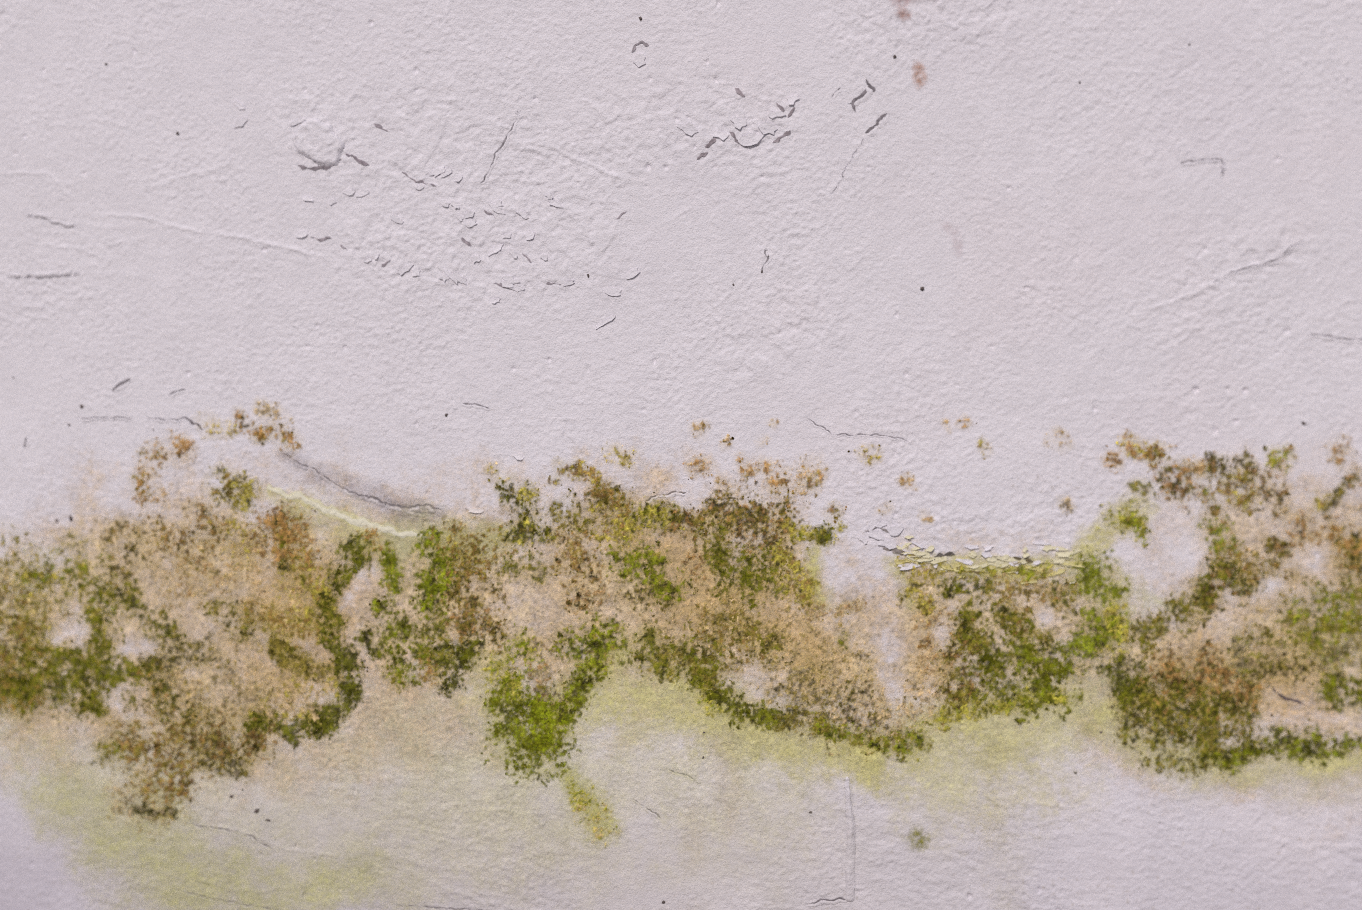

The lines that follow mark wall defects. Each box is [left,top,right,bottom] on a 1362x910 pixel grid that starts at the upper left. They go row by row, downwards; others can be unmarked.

leakage [0,402,1362,809]
peeling [857,521,1087,584]